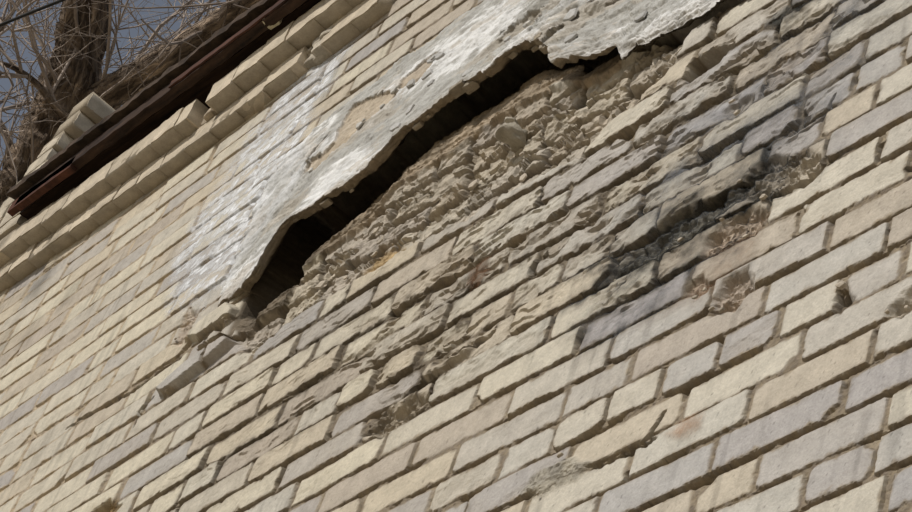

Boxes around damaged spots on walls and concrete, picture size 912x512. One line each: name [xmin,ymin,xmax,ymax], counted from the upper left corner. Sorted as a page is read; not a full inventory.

spalling [724,95,755,121]
damp [662,121,762,183]
peeling [217,0,727,356]
spalling [614,152,824,281]
spalling [688,271,756,316]
spalling [884,292,912,319]
spalling [92,501,120,512]